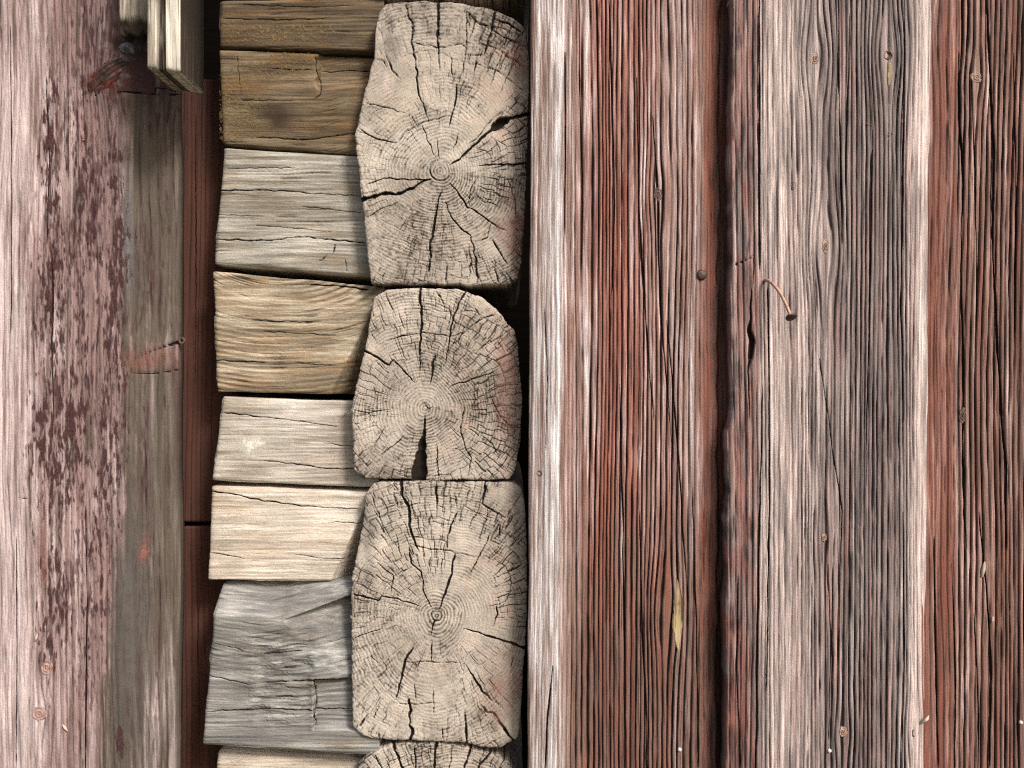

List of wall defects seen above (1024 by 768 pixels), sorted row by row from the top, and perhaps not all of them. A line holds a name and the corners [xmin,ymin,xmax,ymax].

peeling [26,66,137,683]